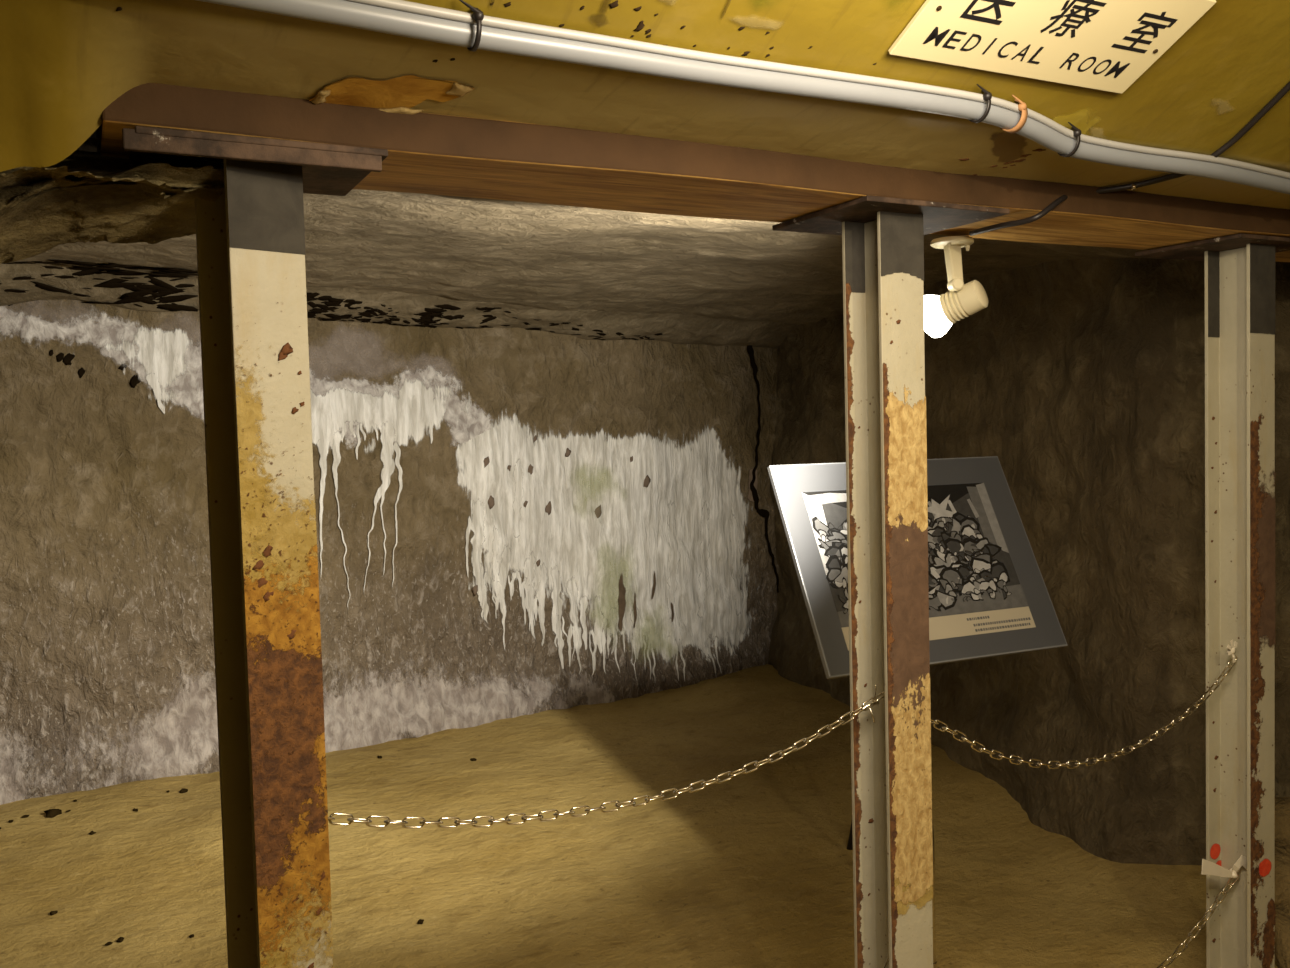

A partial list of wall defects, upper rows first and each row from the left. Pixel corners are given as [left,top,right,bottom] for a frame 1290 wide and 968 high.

peeling [309,75,475,114]
leakage [0,730,50,805]
leakage [0,306,204,420]
leakage [67,673,219,787]
rust [236,350,334,968]
leakage [309,335,759,753]
rust [846,283,865,968]
rust [883,363,933,968]
rust [1250,413,1275,960]